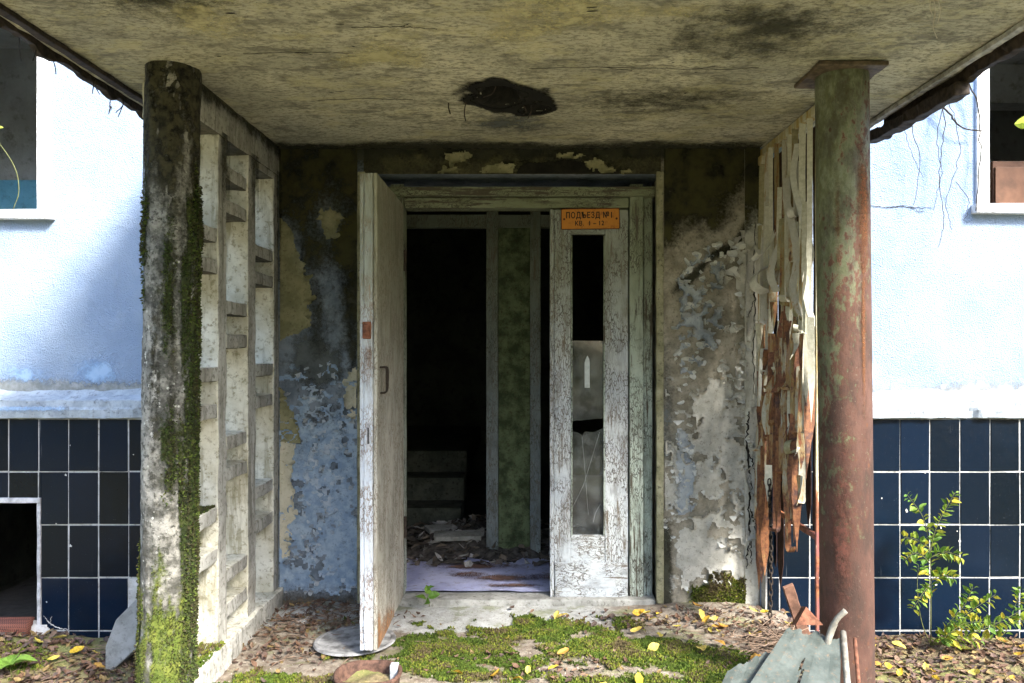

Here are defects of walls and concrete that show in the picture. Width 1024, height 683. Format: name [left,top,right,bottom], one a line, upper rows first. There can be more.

peeling [279,218,317,341]
damp [143,60,765,396]
peeling [438,150,473,174]
hole [448,77,557,121]
spalling [480,152,632,175]
damp [660,2,862,61]
rust [858,163,868,382]
peeling [278,361,357,596]
peeling [663,223,762,591]
crack [745,224,756,569]
rust [832,453,851,600]